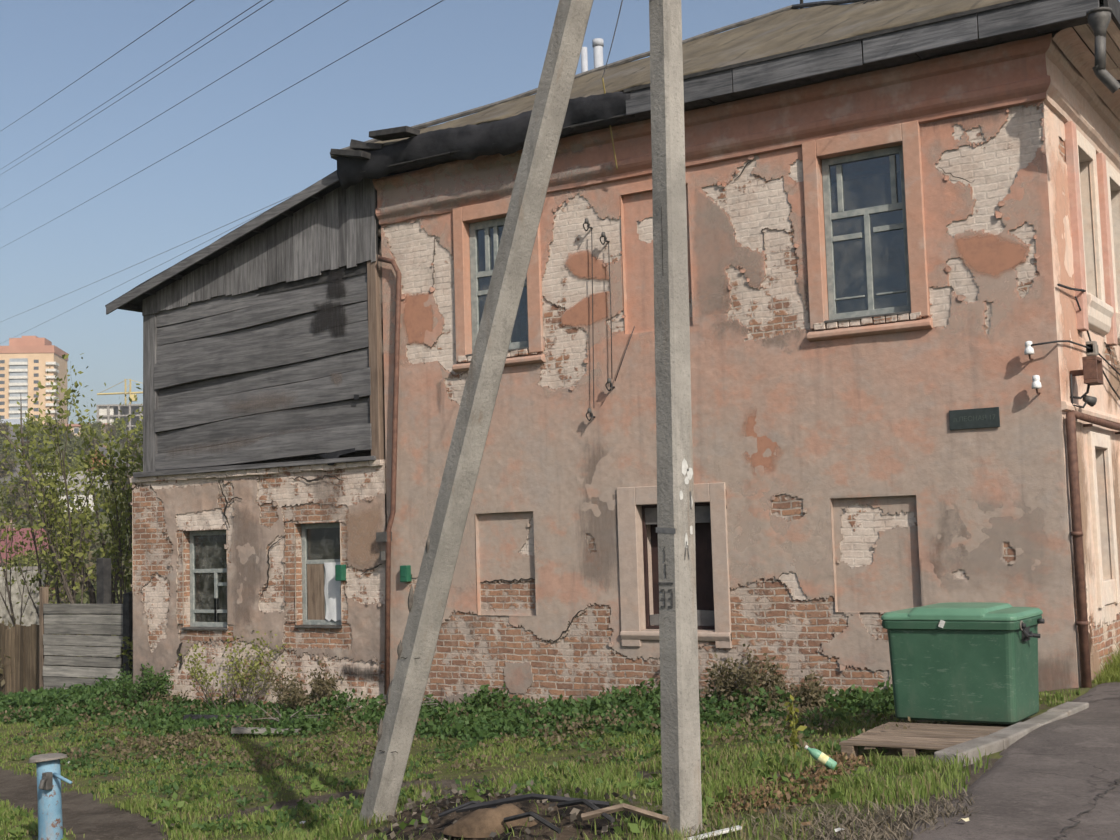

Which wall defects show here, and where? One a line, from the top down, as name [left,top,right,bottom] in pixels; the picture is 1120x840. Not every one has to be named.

flaking render [381,154,521,405]
flaking render [537,193,622,390]
flaking render [637,217,653,244]
flaking render [701,155,810,342]
flaking render [929,257,994,335]
flaking render [935,103,1066,299]
crack [218,480,241,528]
flaking render [130,460,386,708]
flaking render [423,579,660,705]
crack [541,608,586,643]
flaking render [698,571,891,699]
flaking render [837,503,918,569]